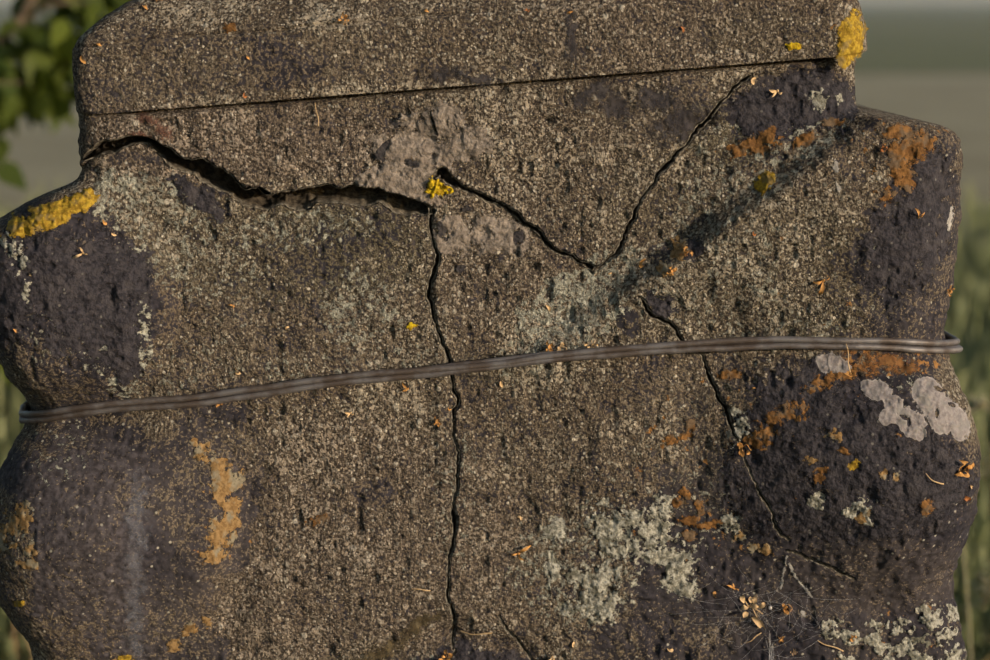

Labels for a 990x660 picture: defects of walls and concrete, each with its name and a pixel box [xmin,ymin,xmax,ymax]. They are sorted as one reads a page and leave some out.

crack [429,112,438,134]
crack [434,74,752,273]
crack [81,135,460,660]
crack [639,297,855,580]
crack [498,616,532,660]